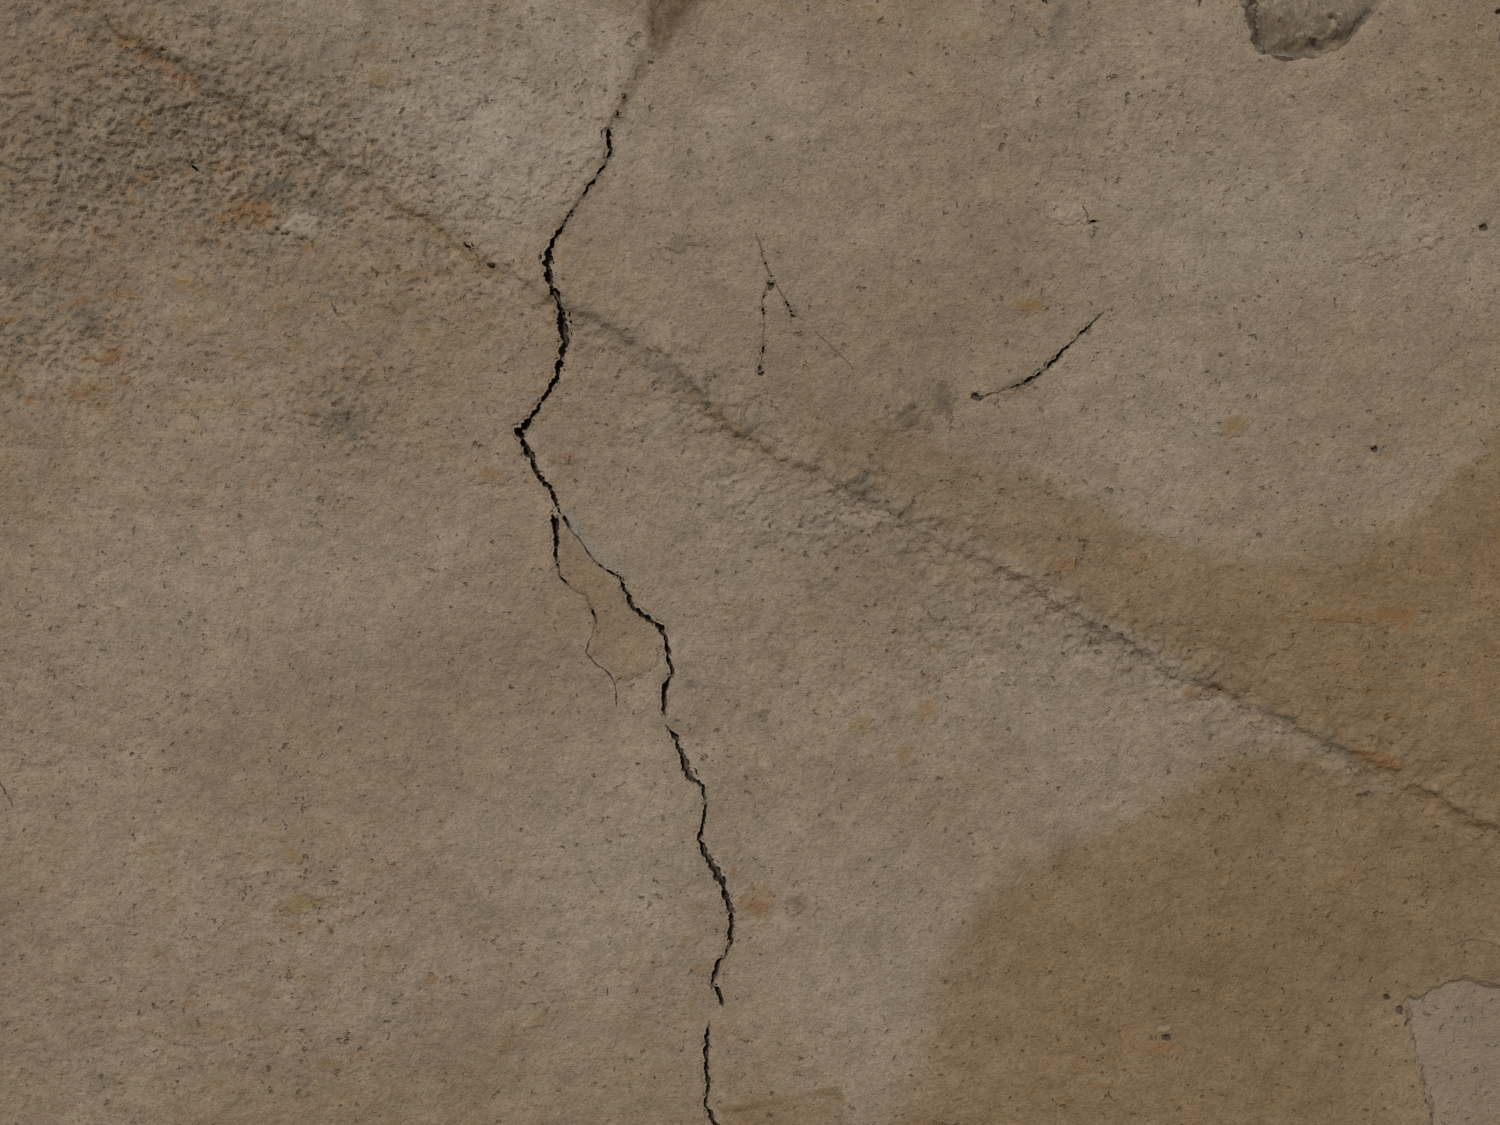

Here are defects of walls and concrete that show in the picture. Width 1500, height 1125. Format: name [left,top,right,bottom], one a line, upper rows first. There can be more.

spalling [1239,0,1384,62]
crack [979,312,1104,398]
crack [512,0,737,1125]